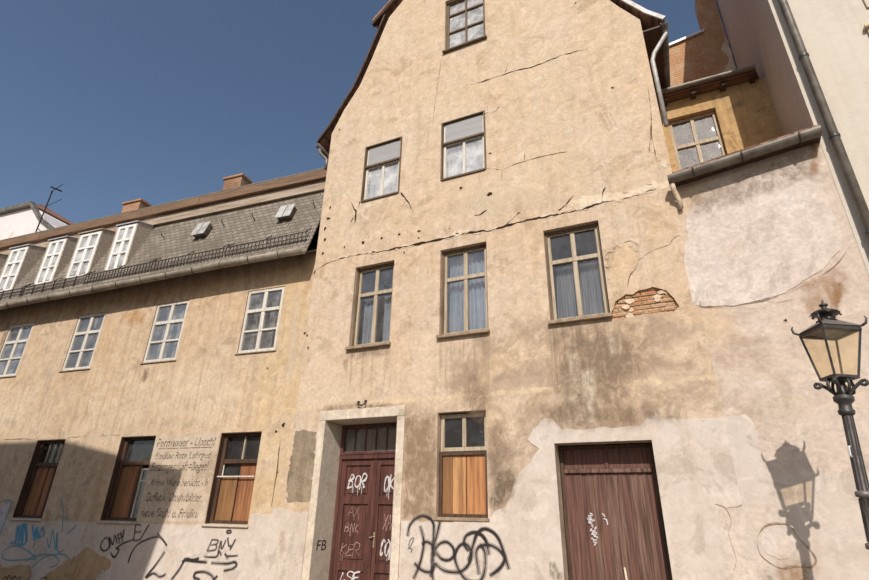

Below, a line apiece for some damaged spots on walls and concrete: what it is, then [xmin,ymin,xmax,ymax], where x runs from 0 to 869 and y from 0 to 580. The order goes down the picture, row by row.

crack [477,48,588,83]
crack [314,90,661,273]
spalling [605,243,679,319]
crack [607,235,680,283]
spalling [275,429,317,503]
peeling [0,564,32,580]
peeling [44,547,111,580]